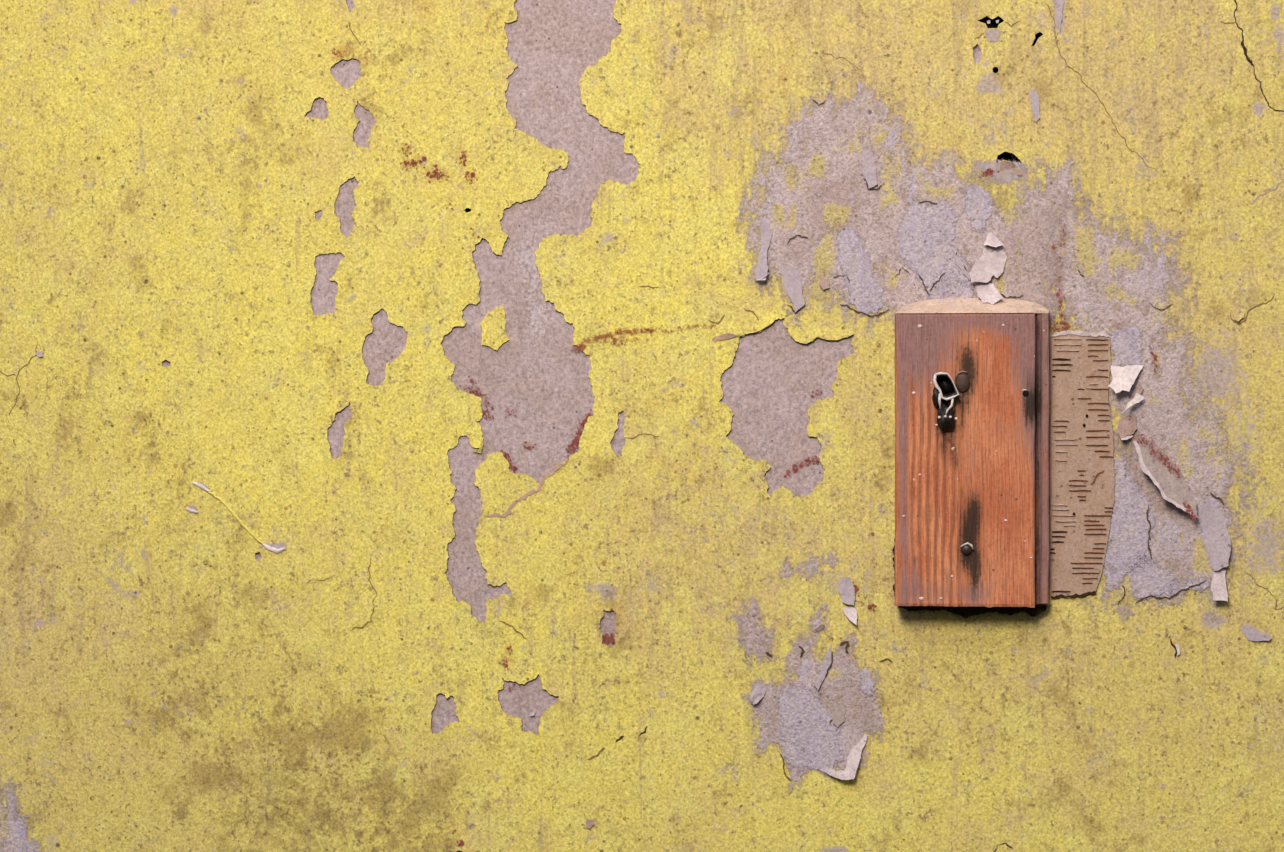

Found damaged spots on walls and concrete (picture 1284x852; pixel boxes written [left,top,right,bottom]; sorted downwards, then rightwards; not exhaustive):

peeling [330,58,375,148]
crack [975,2,1158,172]
crack [1220,0,1284,112]
peeling [315,176,358,237]
peeling [310,252,345,316]
peeling [362,308,408,386]
peeling [441,0,640,622]
rust [572,324,716,353]
peeling [712,81,1272,642]
peeling [431,691,460,733]
peeling [498,675,559,734]
peeling [728,551,892,791]